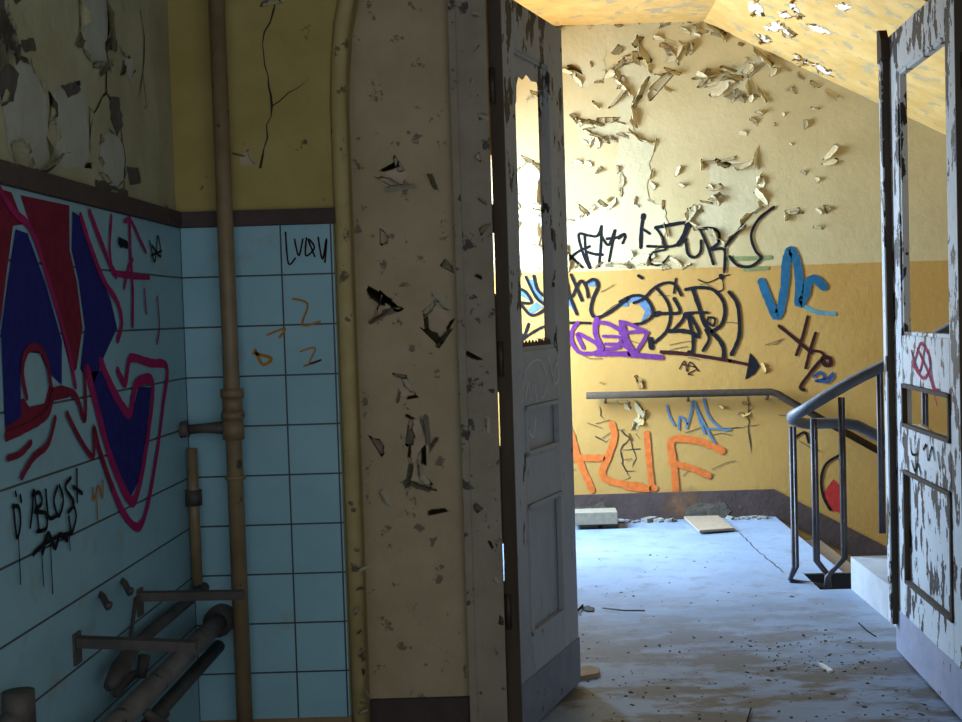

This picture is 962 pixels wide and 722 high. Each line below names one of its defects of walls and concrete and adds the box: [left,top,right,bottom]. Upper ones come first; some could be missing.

peeling [517,155,543,269]
peeling [557,0,840,272]